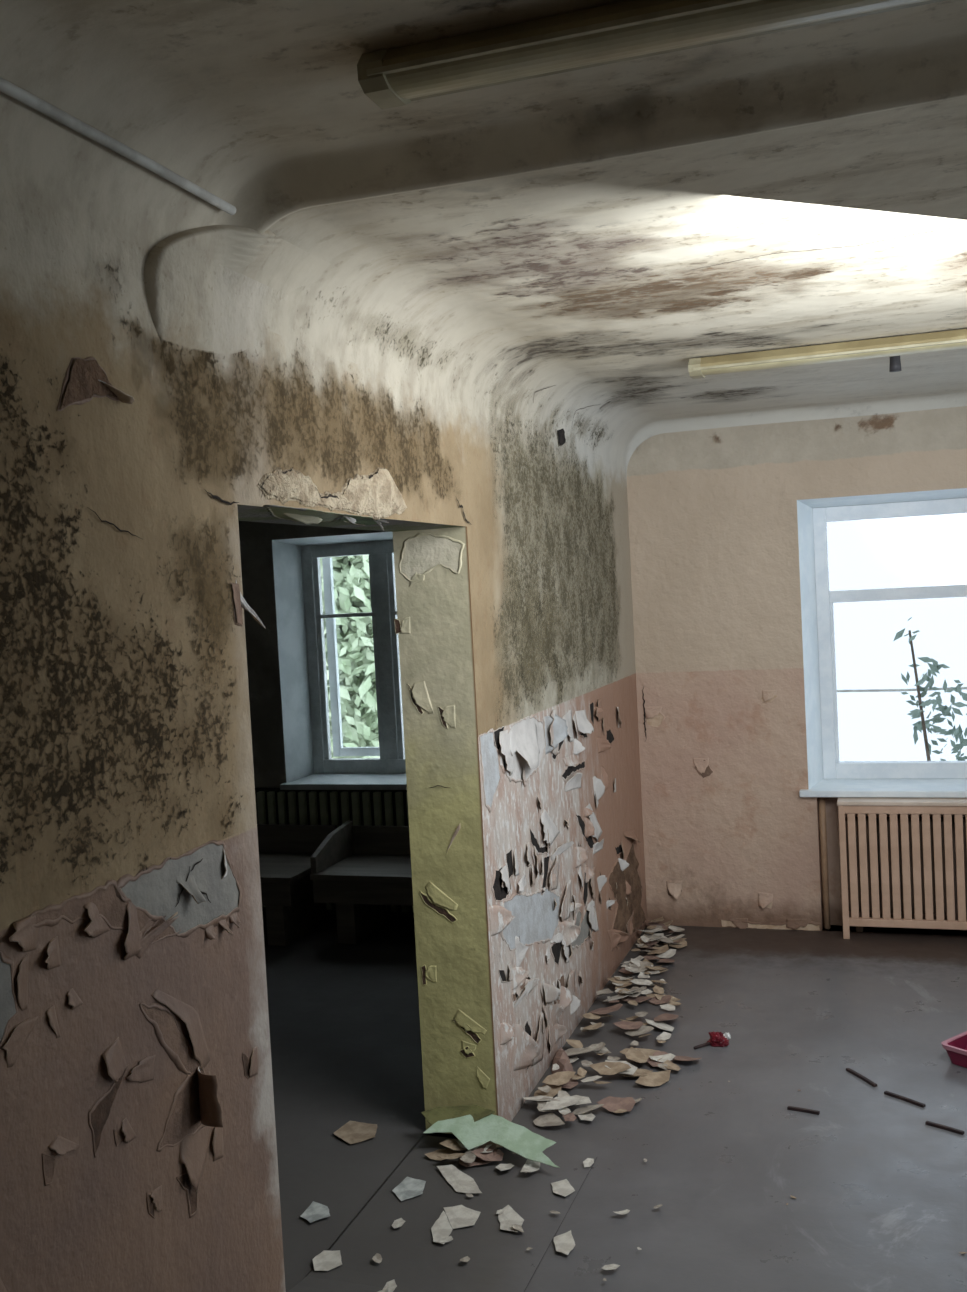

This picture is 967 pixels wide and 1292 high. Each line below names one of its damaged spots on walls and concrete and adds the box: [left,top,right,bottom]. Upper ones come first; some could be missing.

water stain [123,317,454,499]
water stain [427,219,832,372]
water stain [0,357,242,884]
water stain [491,376,772,721]
flaking render [0,840,242,1068]
peeling [42,989,224,1218]
peeling [242,1047,258,1079]
peeling [419,881,458,923]
peeling [452,698,647,1089]